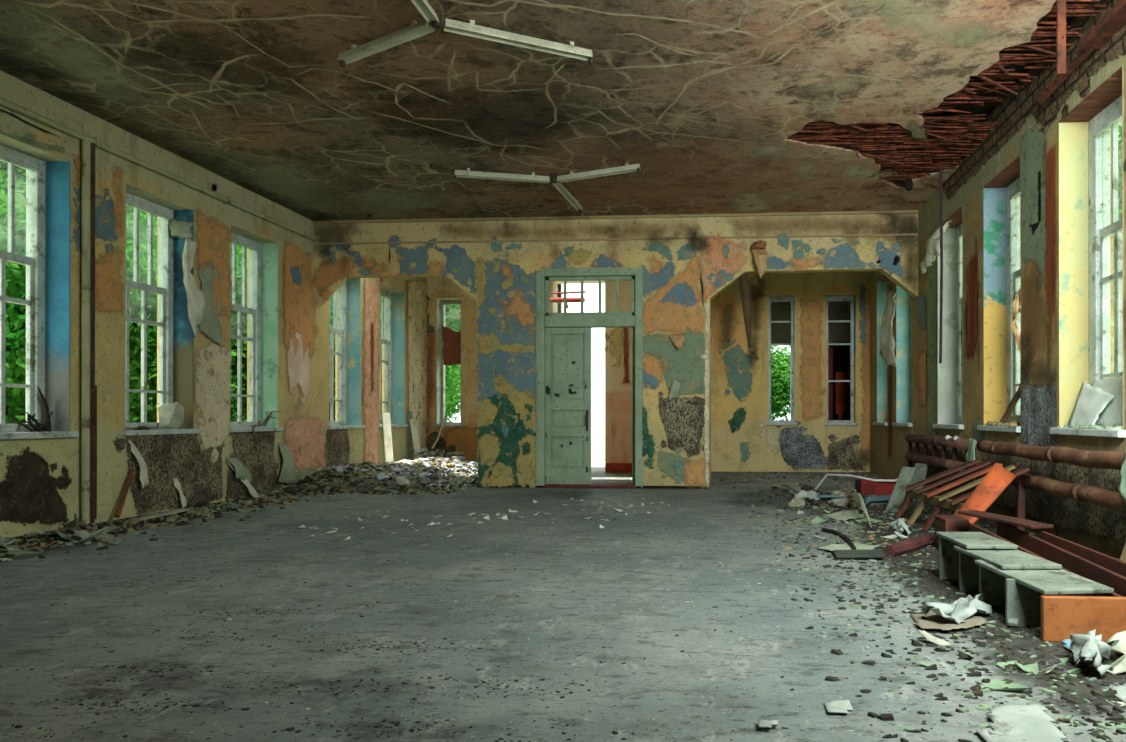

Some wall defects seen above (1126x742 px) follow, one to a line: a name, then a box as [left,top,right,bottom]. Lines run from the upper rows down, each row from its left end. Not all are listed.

crack [0,109,61,138]
crack [15,0,586,172]
crack [450,0,910,143]
spalling [943,0,1126,290]
peeling [766,233,904,298]
spalling [0,447,121,562]
spalling [113,329,350,516]
peeling [387,235,624,488]
peeling [641,232,753,487]
peeling [777,285,870,471]
peeling [912,260,975,491]
spalling [973,375,1126,545]